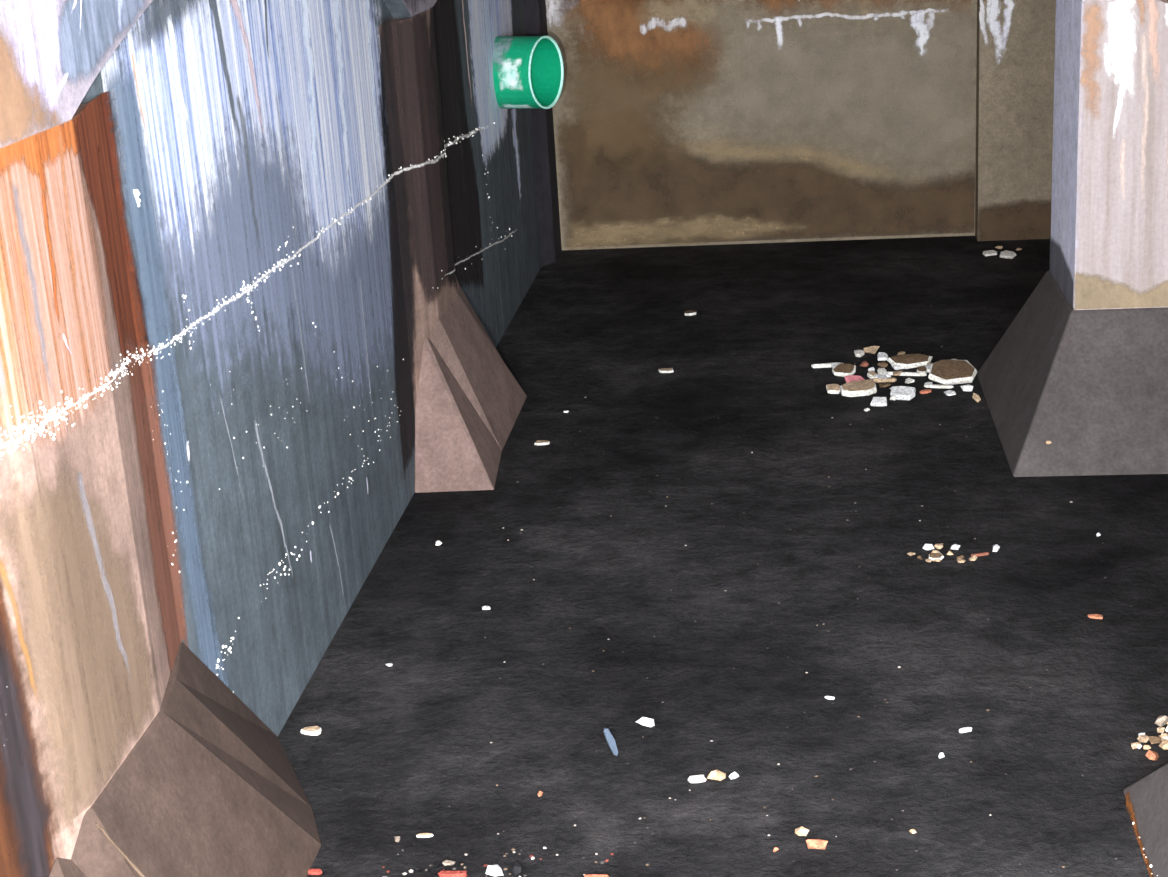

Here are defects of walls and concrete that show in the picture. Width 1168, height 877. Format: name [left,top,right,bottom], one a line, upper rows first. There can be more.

rust [0,36,186,672]
crack [0,122,513,460]
leakage [0,0,521,687]
rust [560,0,720,77]
leakage [641,0,715,33]
leakage [709,0,1014,161]
leakage [561,48,1168,310]
efflorescence [1104,0,1136,132]
rust [1074,0,1168,310]
crack [216,407,398,693]
rust [0,583,54,877]